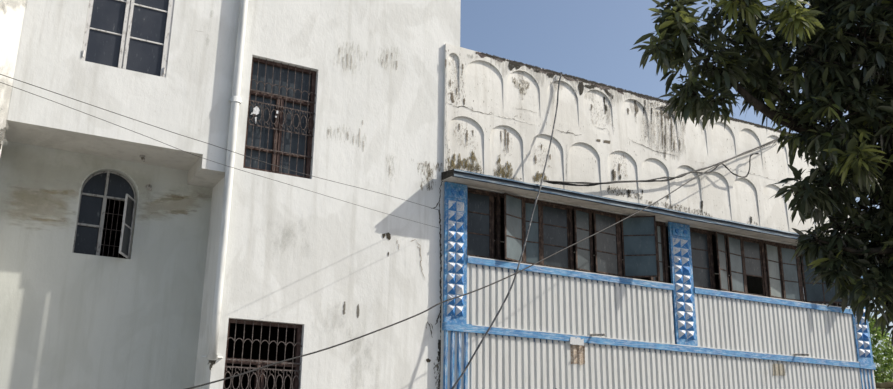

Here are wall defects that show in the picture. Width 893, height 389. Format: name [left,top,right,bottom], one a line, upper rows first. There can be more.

leakage [476,51,681,159]
leakage [719,114,793,135]
leakage [443,149,481,174]